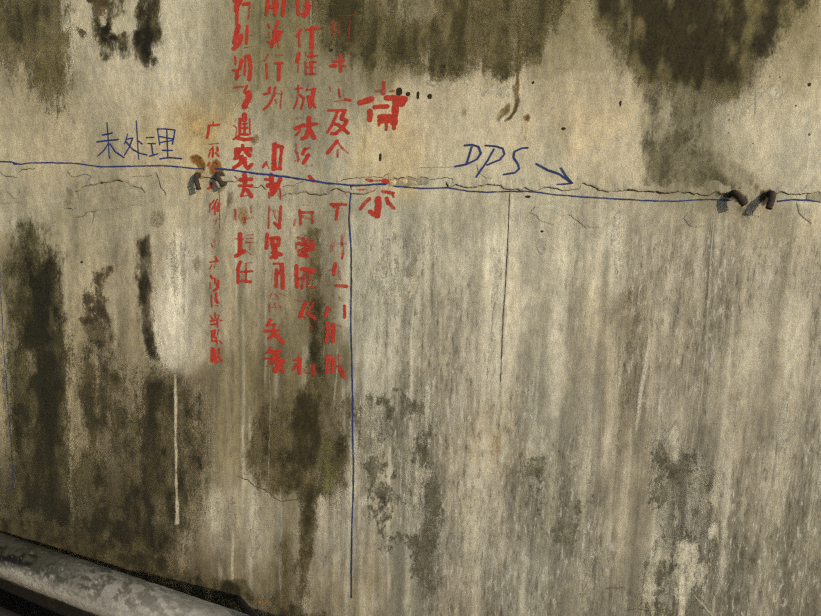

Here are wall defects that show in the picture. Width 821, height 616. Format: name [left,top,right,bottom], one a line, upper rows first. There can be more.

damp [0,0,162,114]
damp [312,0,570,97]
rust [497,17,530,121]
damp [593,0,810,196]
damp [151,211,164,227]
rust [190,155,233,205]
crack [201,173,387,228]
rust [759,189,777,206]
crack [771,184,821,195]
damp [0,219,445,616]
damp [460,491,496,585]